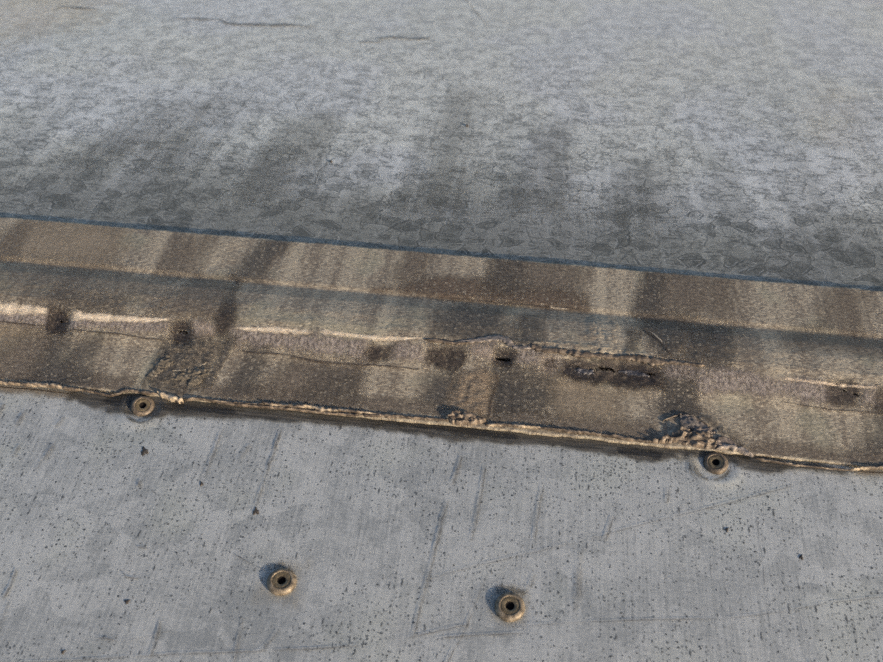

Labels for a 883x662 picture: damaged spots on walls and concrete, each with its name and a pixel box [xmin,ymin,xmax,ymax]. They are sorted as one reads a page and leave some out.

peeling [0,334,883,472]